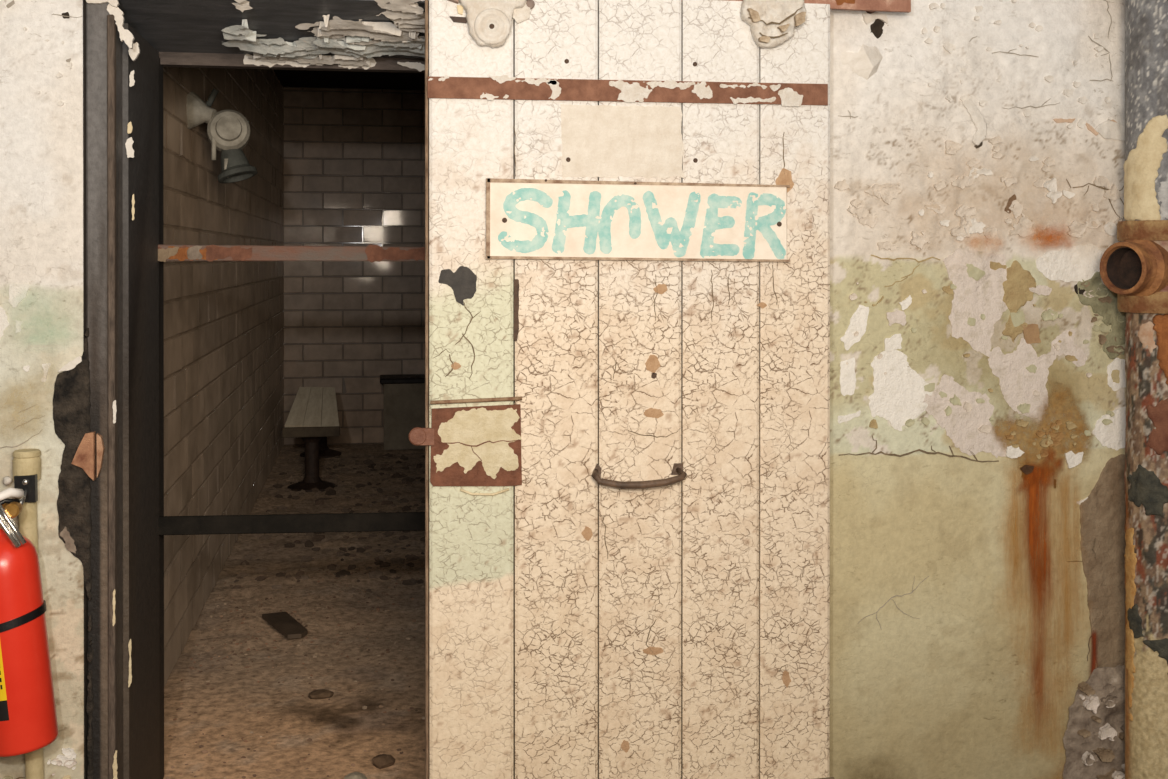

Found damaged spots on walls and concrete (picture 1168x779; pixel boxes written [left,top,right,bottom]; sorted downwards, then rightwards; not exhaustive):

peeling [221,0,425,72]
spalling [862,12,888,39]
peeling [0,284,30,338]
peeling [438,266,477,306]
rust [1138,314,1168,455]
crack [440,440,518,474]
crack [839,436,999,462]
spalling [834,68,1126,779]
spalling [23,328,94,779]
rust [1013,453,1061,605]
rust [1124,528,1137,721]